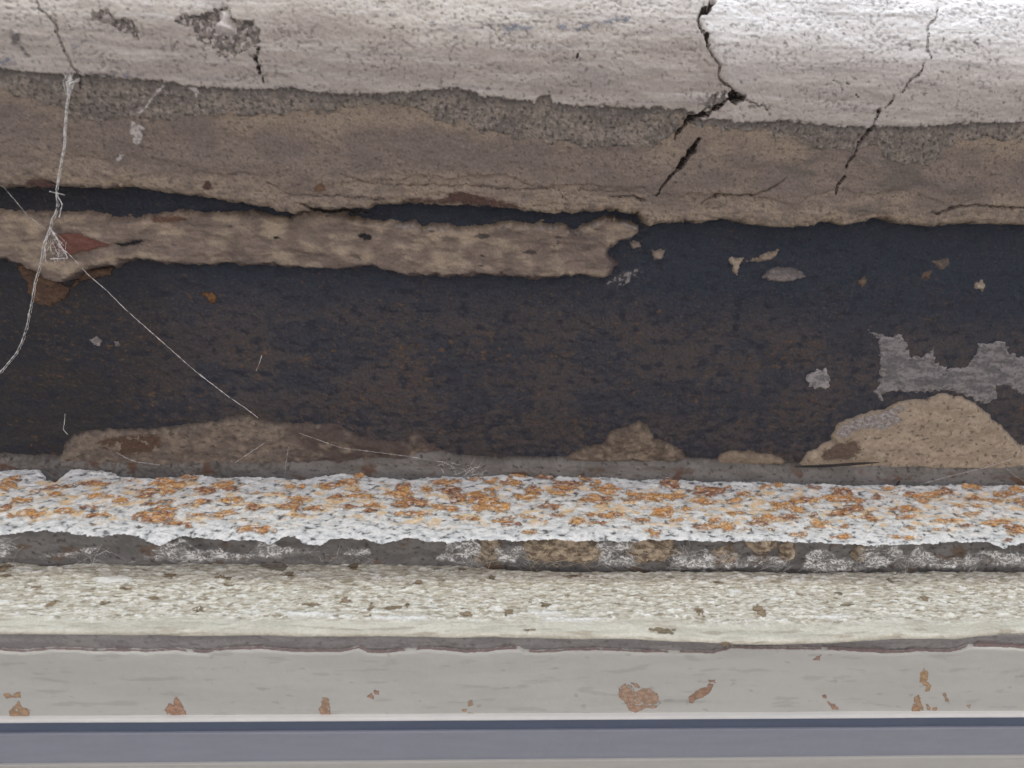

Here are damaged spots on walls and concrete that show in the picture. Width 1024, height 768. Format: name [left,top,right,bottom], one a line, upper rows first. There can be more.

spalling [174,6,261,58]
crack [301,2,768,214]
crack [833,9,939,194]
rust [0,472,1024,542]